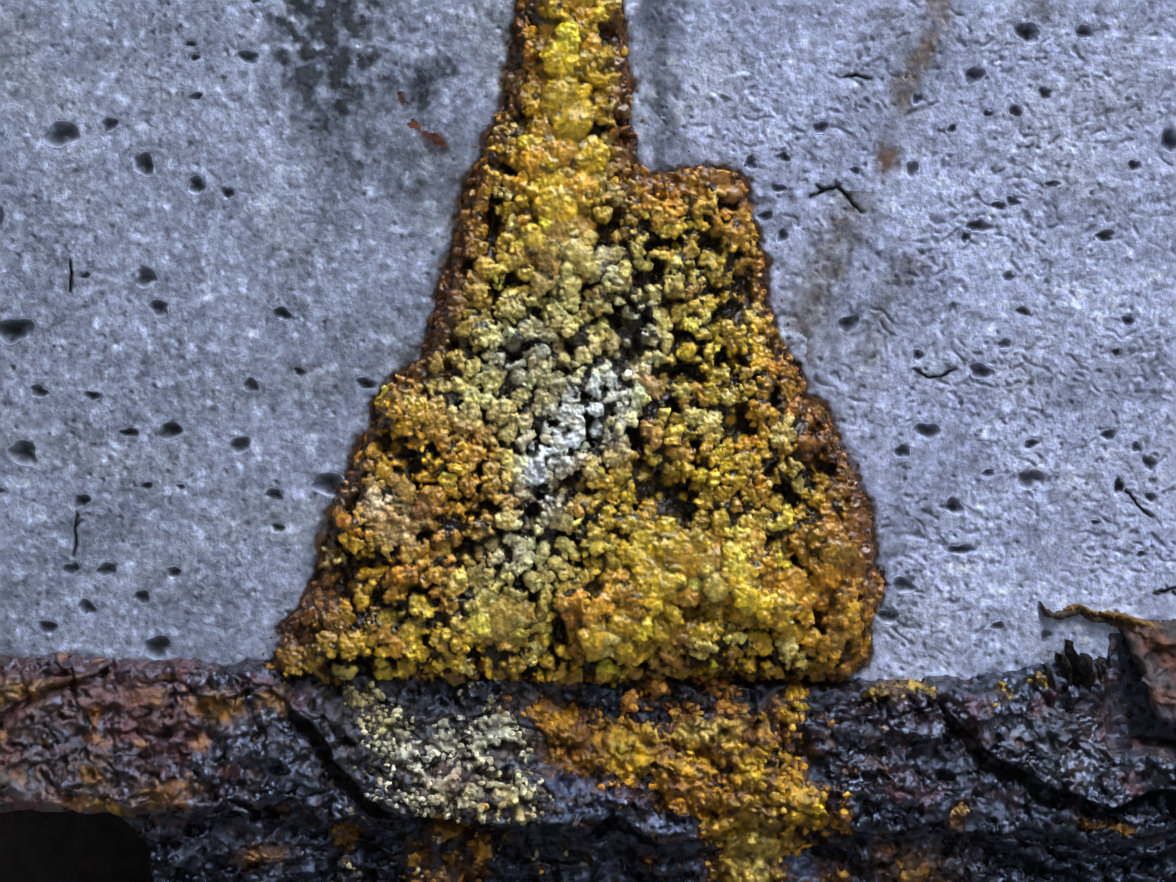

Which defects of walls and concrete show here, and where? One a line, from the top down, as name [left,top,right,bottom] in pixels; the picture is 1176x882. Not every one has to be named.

rust [899,33,939,95]
rust [397,60,455,150]
crack [1118,484,1150,516]
rust [193,692,241,720]
rust [92,799,122,817]